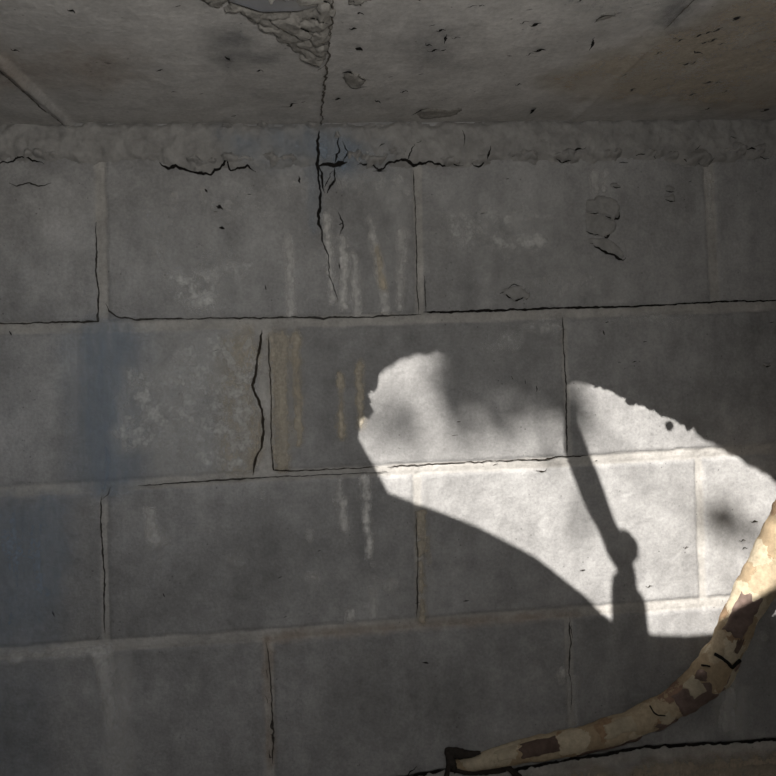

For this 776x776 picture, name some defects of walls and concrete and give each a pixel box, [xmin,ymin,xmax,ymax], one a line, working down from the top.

spalling [201,0,336,67]
water stain [324,214,361,316]
crack [0,1,776,486]
spalling [585,196,626,261]
crack [97,487,111,639]
crack [413,511,421,615]
crack [515,738,776,771]